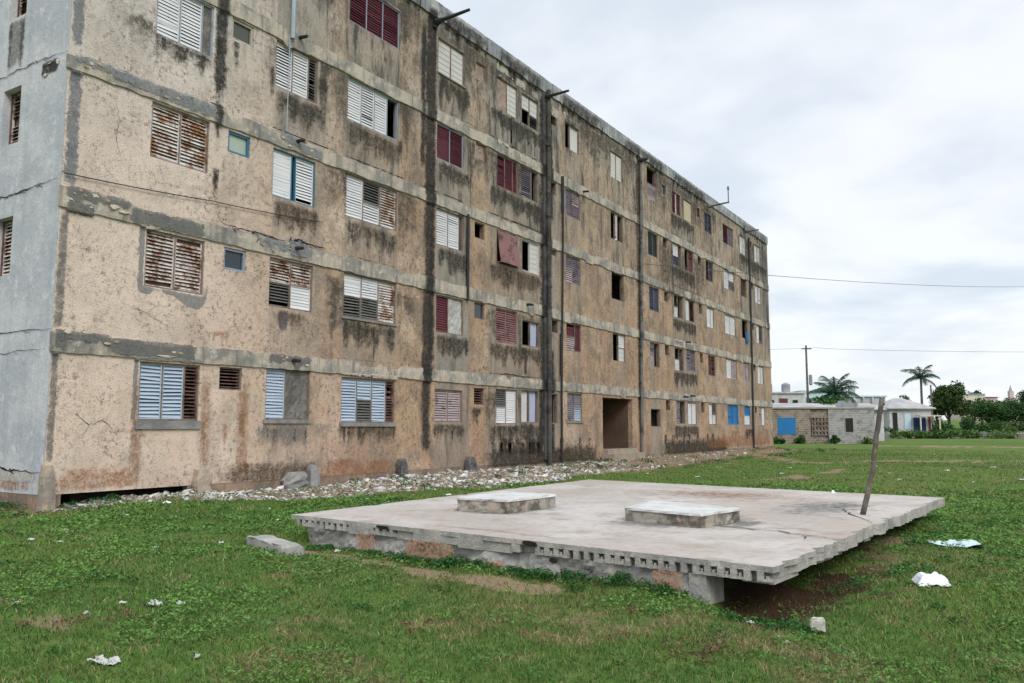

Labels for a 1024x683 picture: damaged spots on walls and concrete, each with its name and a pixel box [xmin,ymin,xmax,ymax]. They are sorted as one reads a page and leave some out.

crack [0,177,57,198]
spalling [47,0,218,461]
damp [131,0,239,137]
damp [271,0,715,467]